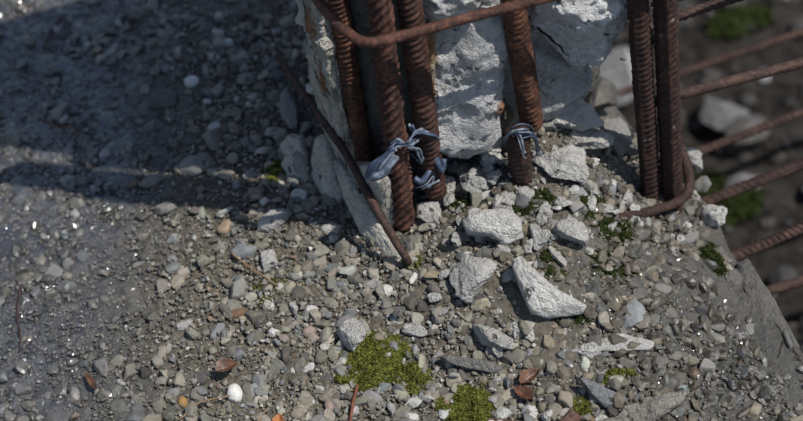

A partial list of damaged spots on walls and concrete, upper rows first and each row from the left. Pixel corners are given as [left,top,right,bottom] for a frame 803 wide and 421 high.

spalling [295,0,402,263]
spalling [422,0,500,24]
spalling [427,15,519,159]
crack [528,15,569,57]
spalling [527,0,628,121]